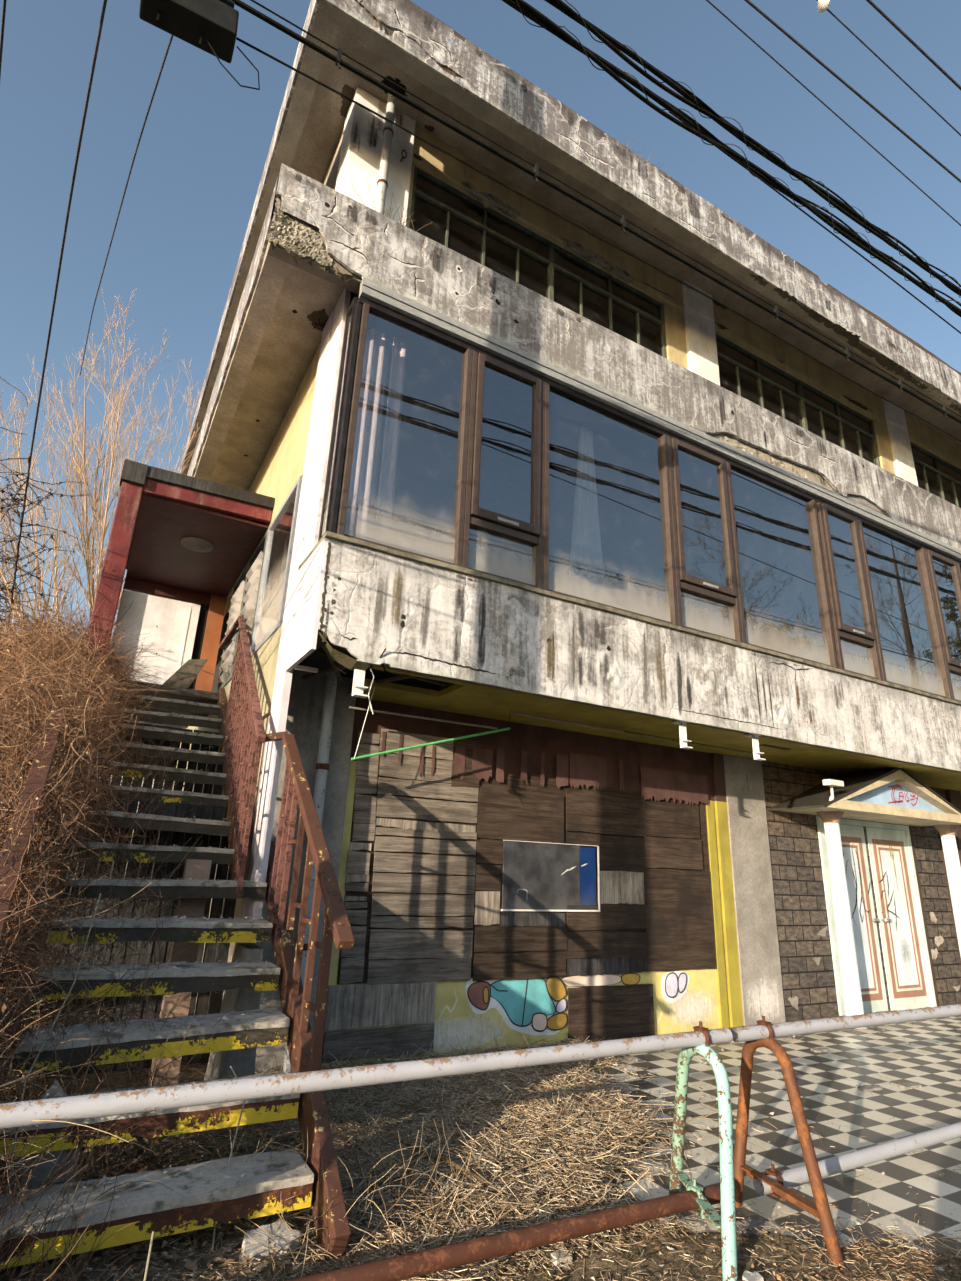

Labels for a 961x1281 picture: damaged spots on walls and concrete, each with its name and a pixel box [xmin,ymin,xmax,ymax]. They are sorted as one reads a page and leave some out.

crack [356,0,453,71]
water stain [340,84,355,118]
spalling [269,196,359,285]
water stain [347,205,377,224]
water stain [429,252,443,273]
water stain [477,269,496,294]
water stain [665,175,699,218]
water stain [375,573,402,625]
water stain [450,572,486,667]
water stain [547,612,609,685]
water stain [644,642,692,714]
water stain [742,654,797,719]